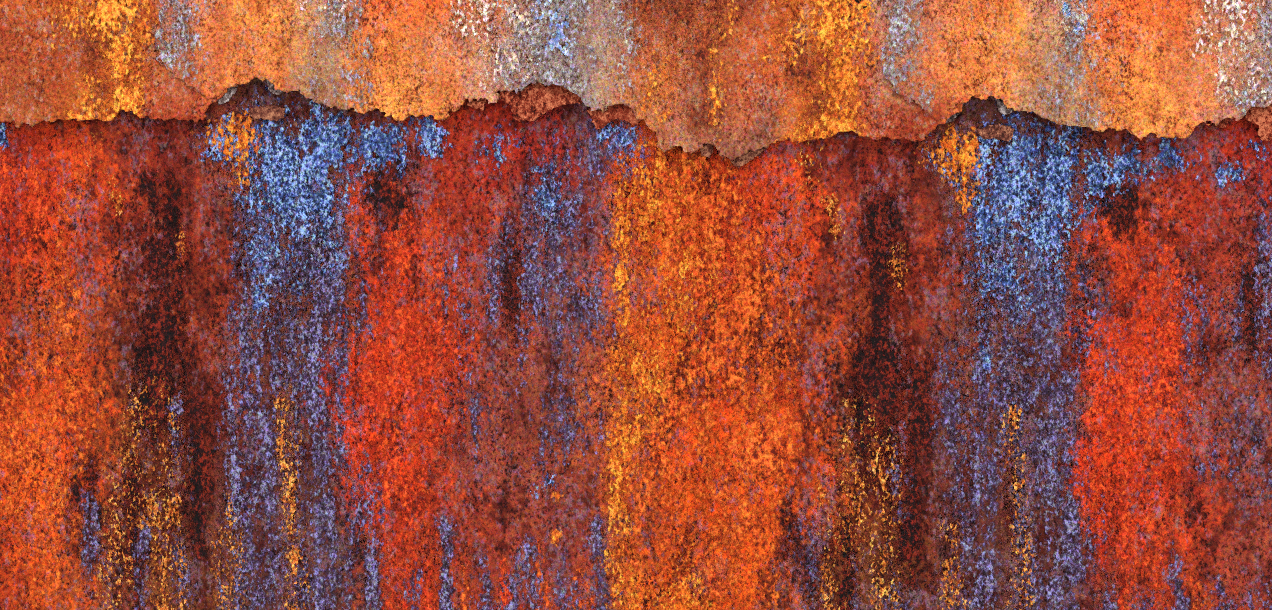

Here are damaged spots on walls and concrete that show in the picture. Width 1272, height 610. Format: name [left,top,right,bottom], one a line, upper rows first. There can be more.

corrosion [0,130,82,284]
corrosion [205,105,286,187]
corrosion [487,217,525,329]
corrosion [821,190,845,240]
corrosion [1232,239,1272,358]
corrosion [0,170,245,610]
corrosion [338,150,467,610]
corrosion [1066,173,1212,610]
corrosion [274,386,310,610]
corrosion [535,529,562,610]
corrosion [937,520,970,610]
corrosion [1000,405,1037,610]